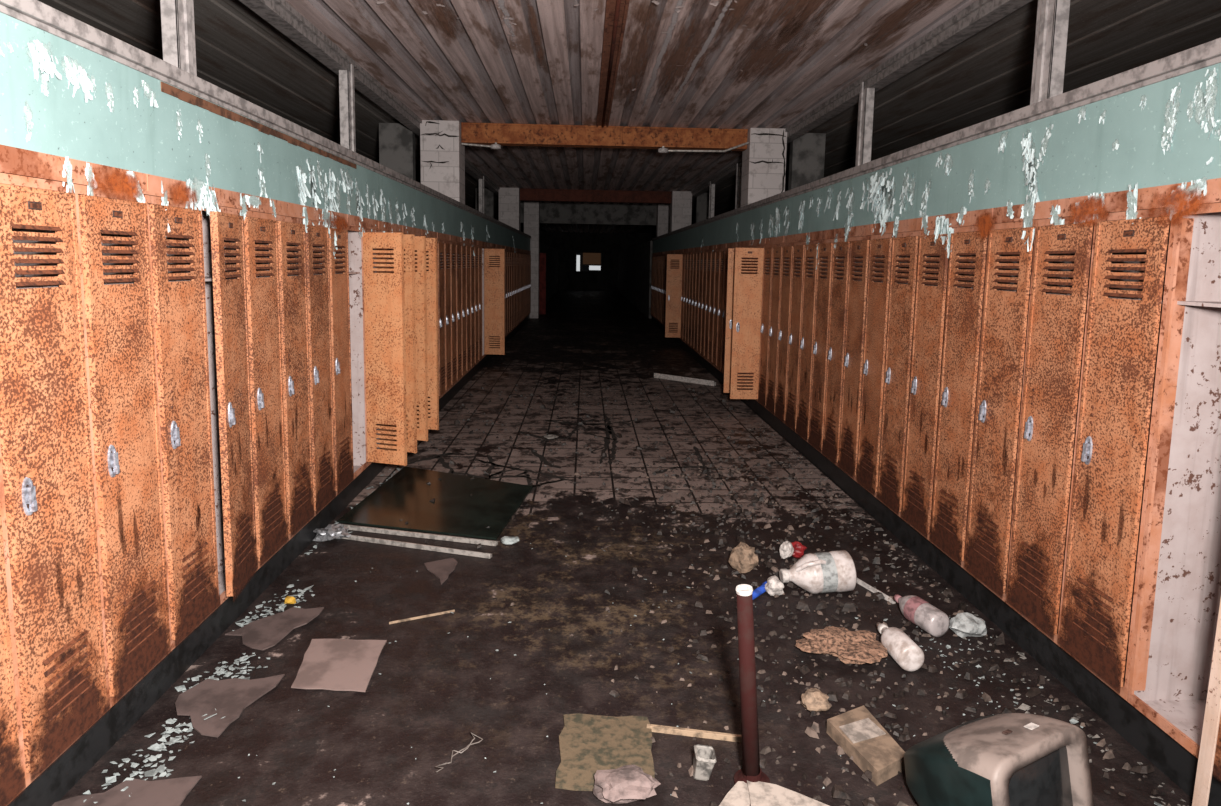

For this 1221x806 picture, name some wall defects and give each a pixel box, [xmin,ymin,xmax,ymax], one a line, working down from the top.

peeling [0,40,114,112]
peeling [1161,67,1221,155]
peeling [62,157,96,196]
rust [170,182,196,206]
spalling [133,80,445,258]
peeling [998,124,1076,252]
rust [1071,197,1108,227]
peeling [1126,182,1141,224]
rust [1152,185,1207,224]
rust [758,358,1124,693]
rust [0,398,354,806]
rust [1212,728,1221,780]